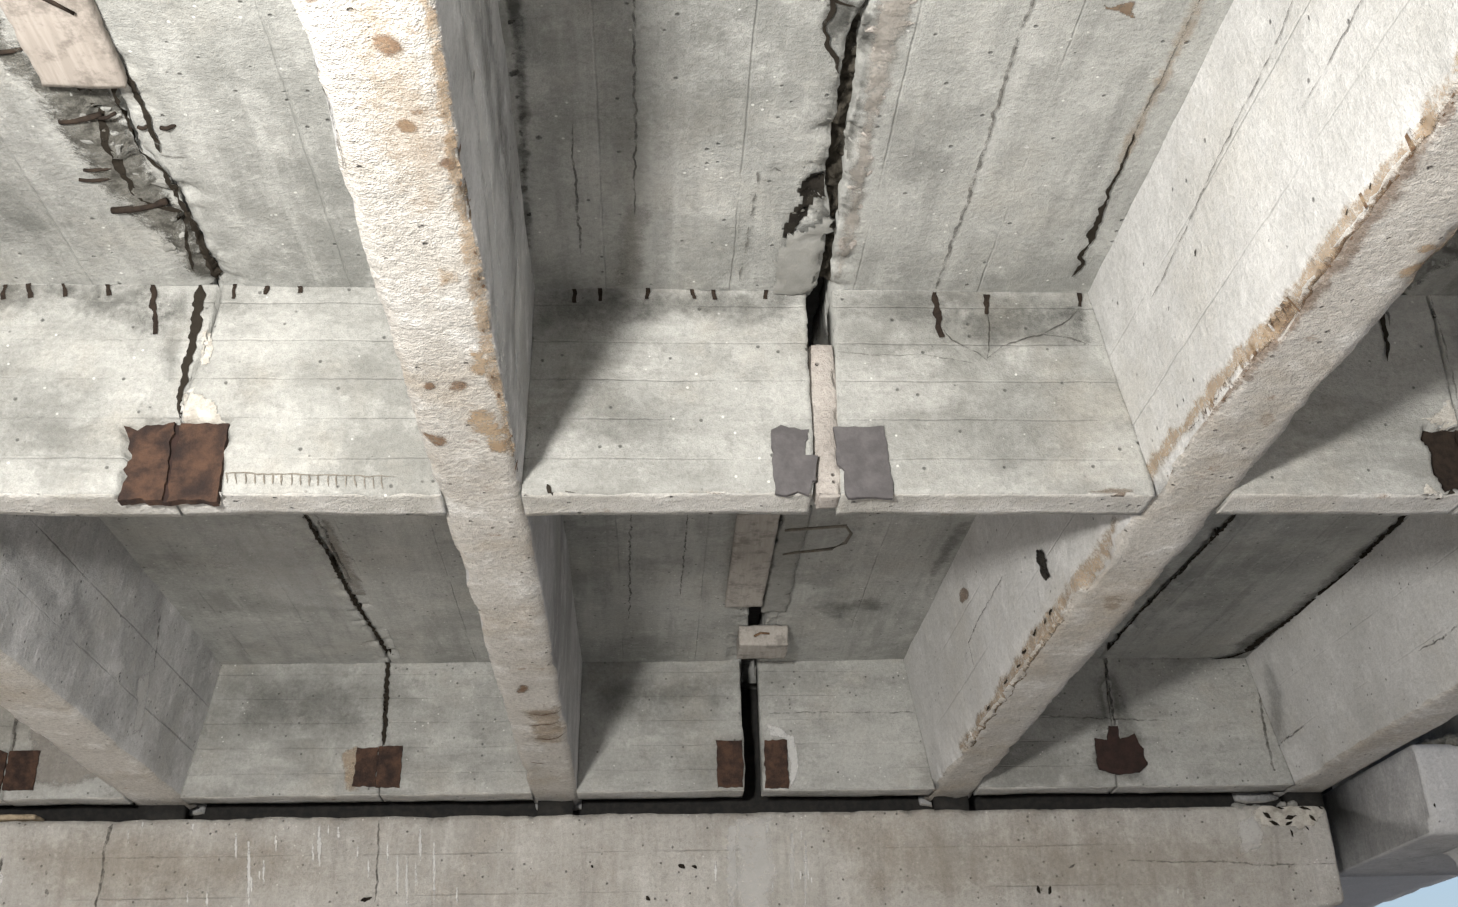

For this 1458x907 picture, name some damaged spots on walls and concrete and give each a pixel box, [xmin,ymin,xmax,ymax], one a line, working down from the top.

crack [822,0,856,73]
spalling [0,20,211,276]
crack [77,67,223,422]
crack [936,0,1193,355]
spalling [1407,230,1458,289]
crack [304,515,391,745]
spalling [1036,549,1050,581]
crack [1105,514,1237,725]
crack [1215,515,1408,659]
spalling [1251,805,1325,837]